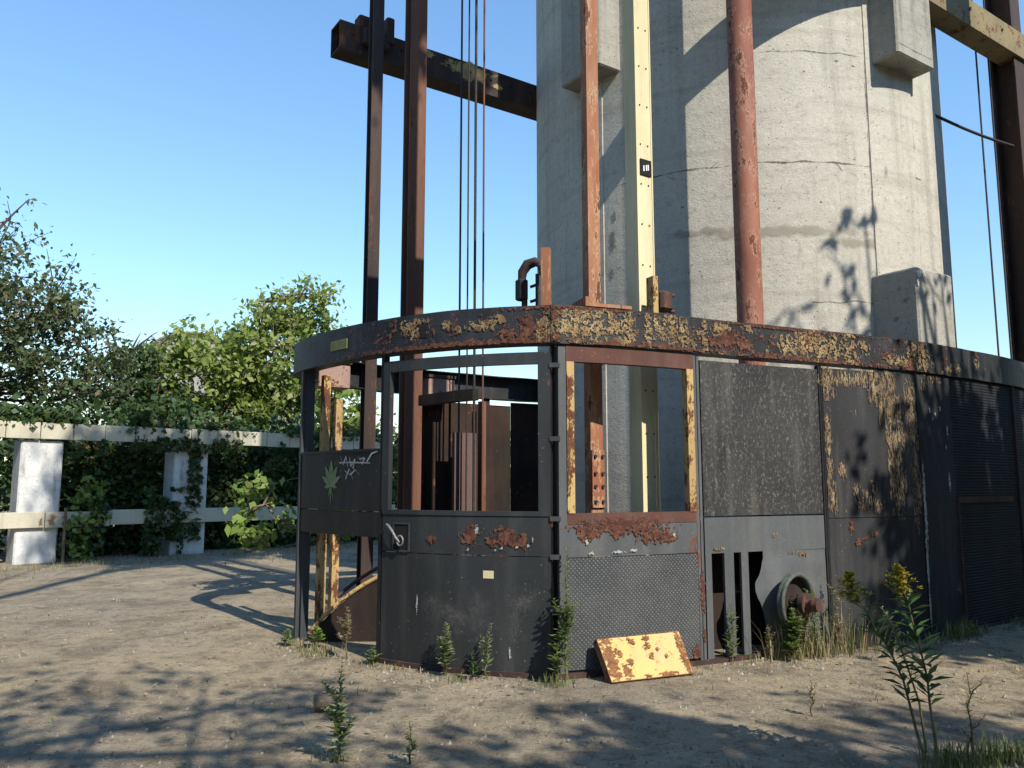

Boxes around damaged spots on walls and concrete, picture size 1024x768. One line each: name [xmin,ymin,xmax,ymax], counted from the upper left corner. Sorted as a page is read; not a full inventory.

peeling [401,317,430,340]
peeling [442,314,506,333]
peeling [536,305,753,355]
peeling [766,328,962,630]
corrosion [458,522,532,552]
corrosion [551,516,682,545]